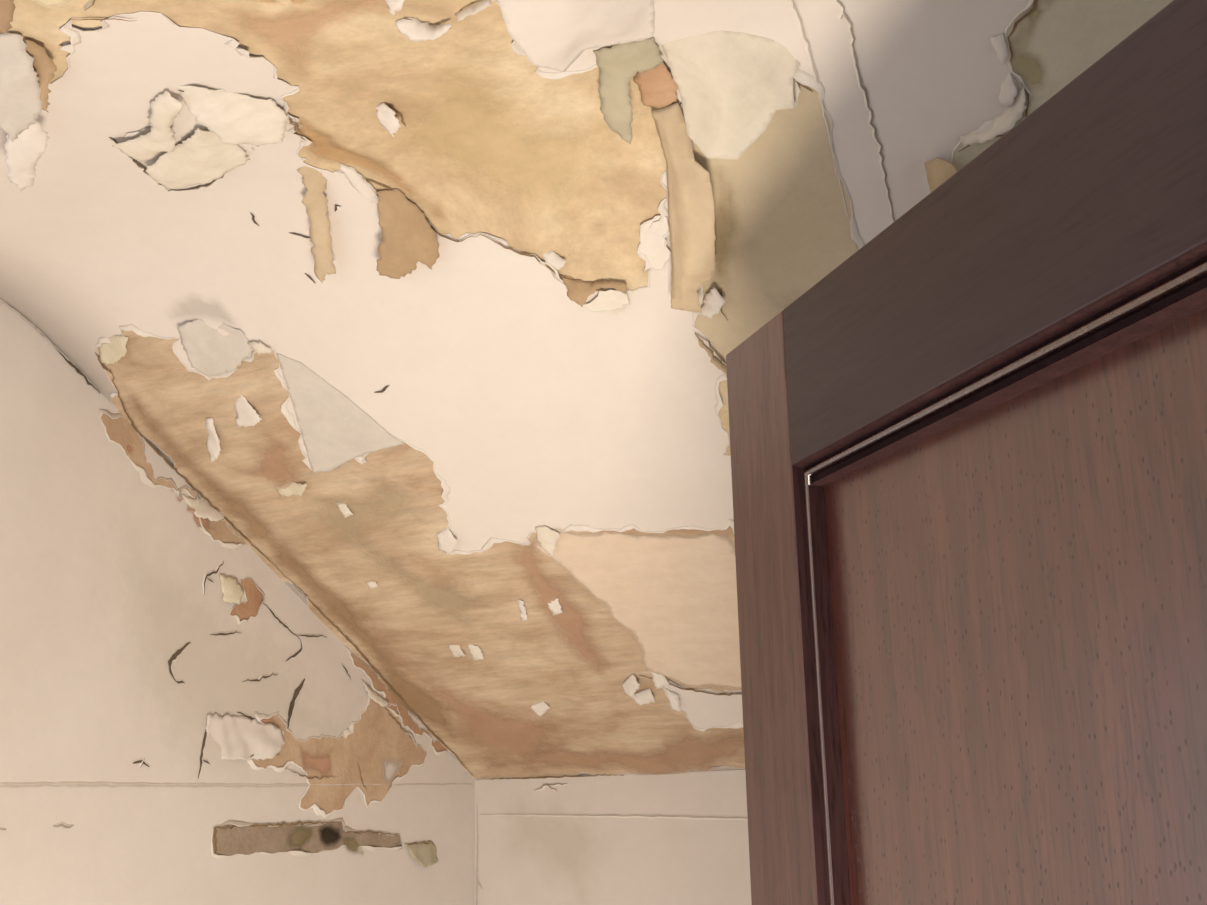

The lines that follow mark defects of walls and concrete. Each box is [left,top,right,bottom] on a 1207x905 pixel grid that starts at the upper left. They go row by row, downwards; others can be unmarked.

crack [789,0,856,247]
crack [835,0,895,222]
peeling [925,0,1173,193]
peeling [0,0,864,456]
crack [168,630,242,684]
crack [202,561,224,594]
crack [237,711,256,720]
crack [242,600,327,729]
peeling [95,319,745,868]
crack [0,730,748,905]